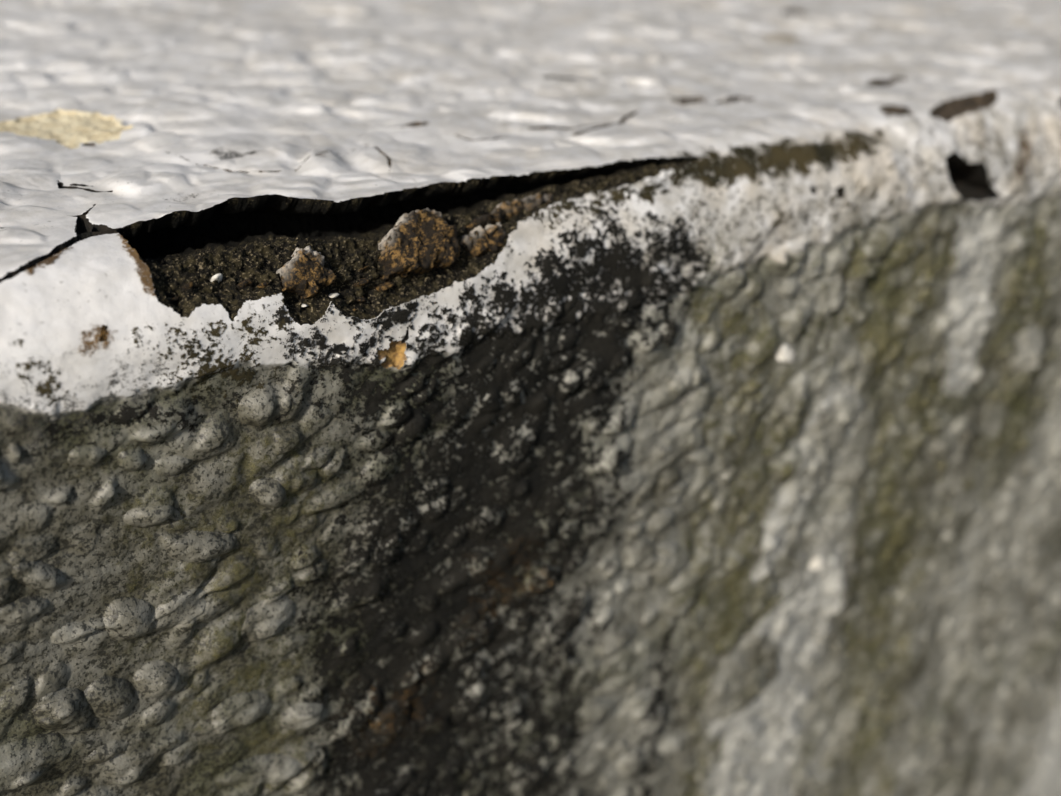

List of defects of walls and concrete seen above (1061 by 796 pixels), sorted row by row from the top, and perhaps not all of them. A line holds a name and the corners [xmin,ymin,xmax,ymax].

peeling [879,105,915,117]
spalling [929,90,998,122]
crack [0,181,121,283]
spalling [114,156,707,325]
water stain [13,203,712,796]